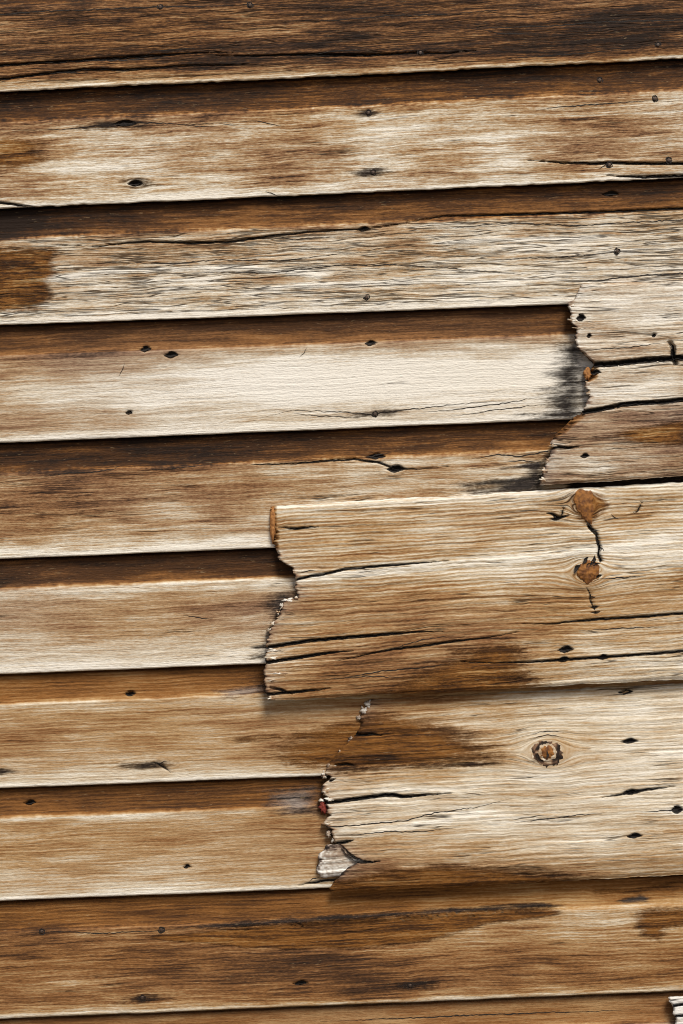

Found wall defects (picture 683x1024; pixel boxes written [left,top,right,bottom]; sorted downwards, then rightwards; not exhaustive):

leakage [540,342,586,419]
crack [251,452,449,470]
crack [481,446,577,463]
crack [541,504,683,631]
crack [267,631,683,695]
peeling [318,736,352,843]
crack [326,764,682,863]